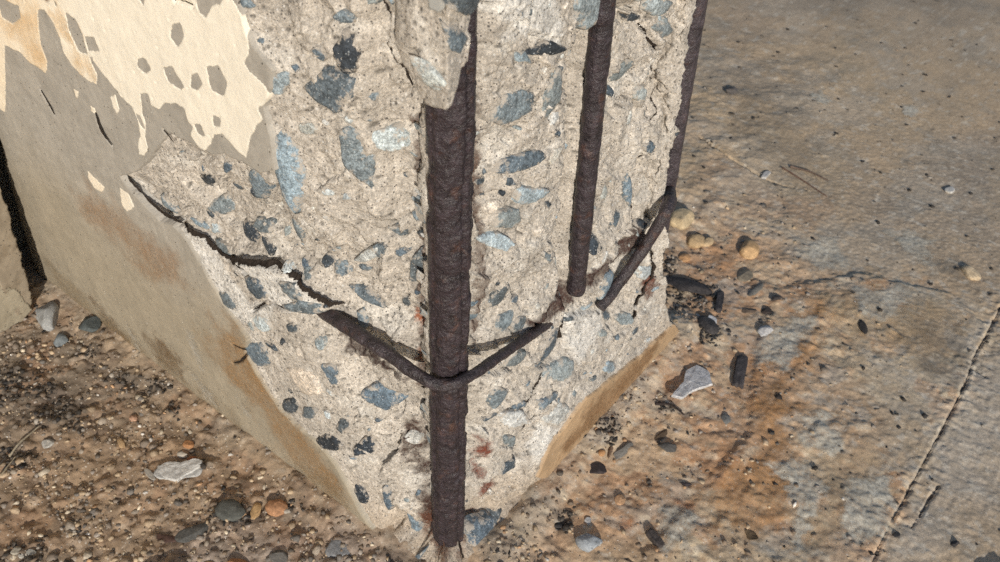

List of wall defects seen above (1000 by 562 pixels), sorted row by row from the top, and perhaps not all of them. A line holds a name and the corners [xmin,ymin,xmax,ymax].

crack [128,177,345,307]
spalling [0,0,713,562]
corrosion [527,280,574,328]
corrosion [586,223,646,286]
corrosion [642,276,658,297]
corrosion [346,335,397,374]
corrosion [401,420,431,473]
corrosion [471,442,491,493]
corrosion [421,492,447,559]